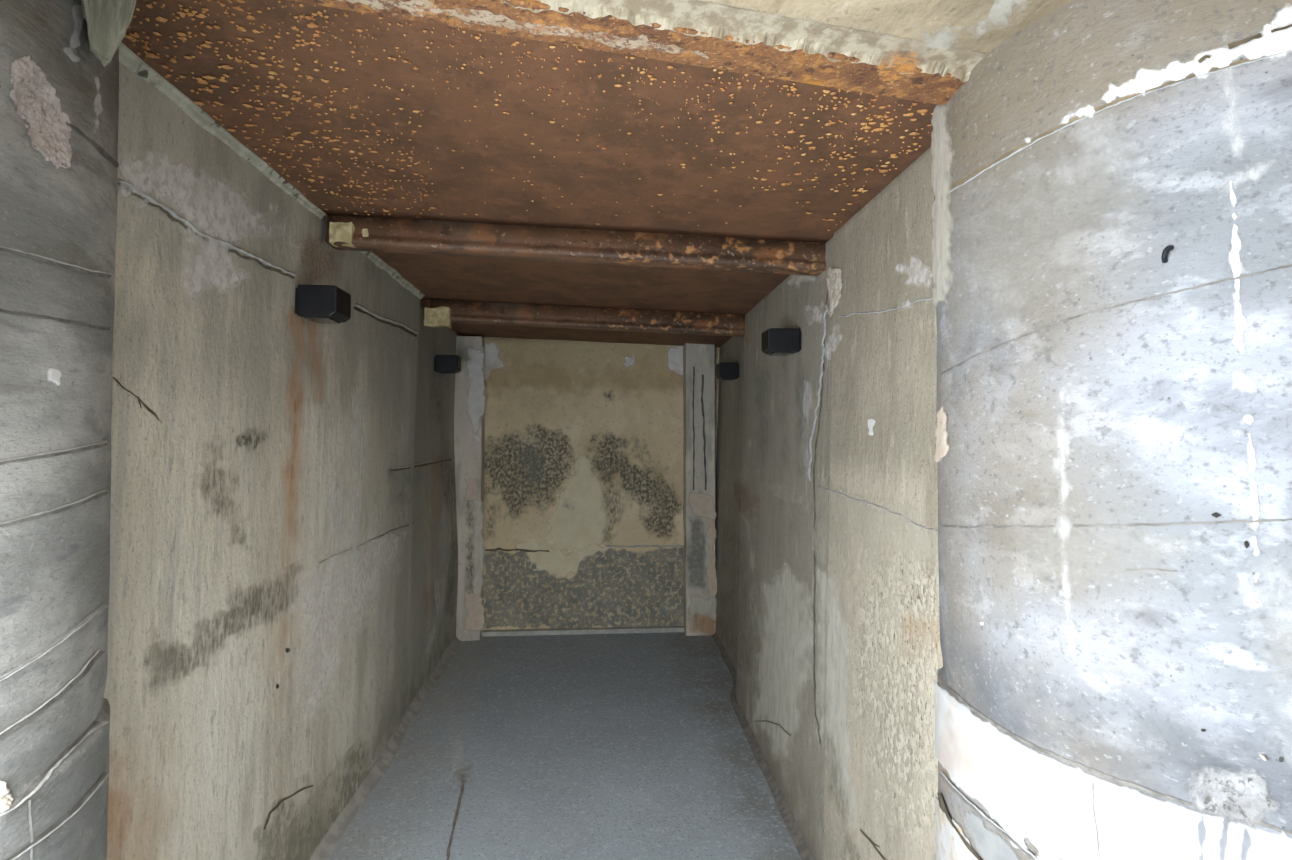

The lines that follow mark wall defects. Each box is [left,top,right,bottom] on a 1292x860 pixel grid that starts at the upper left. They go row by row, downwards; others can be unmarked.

spalling [9,55,73,169]
rust [125,0,933,231]
leakage [144,477,399,709]
leakage [430,425,705,641]
spalling [0,781,14,812]
crack [447,780,465,860]
peeling [935,680,1292,860]